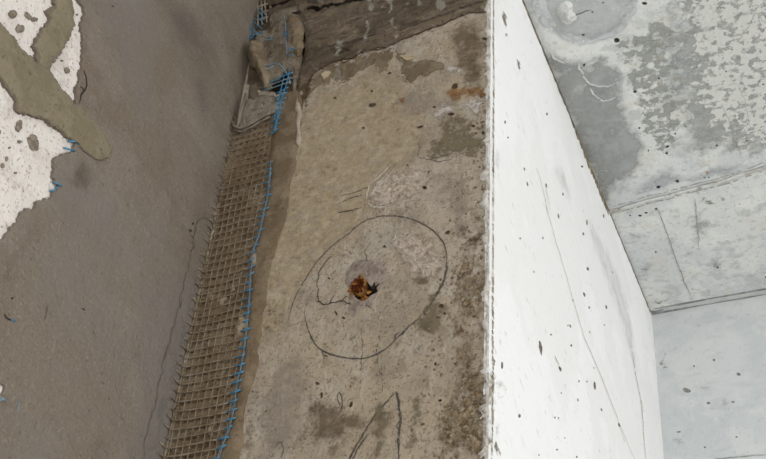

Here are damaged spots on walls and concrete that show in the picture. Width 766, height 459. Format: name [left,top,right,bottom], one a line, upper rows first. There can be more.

spalling [0,0,52,57]
spalling [0,83,79,239]
spalling [50,0,82,100]
crack [143,214,210,459]
peeling [230,0,445,146]
corrosion [347,274,371,301]
crack [299,0,495,459]
corrosion [447,86,485,100]
damp [548,0,766,200]